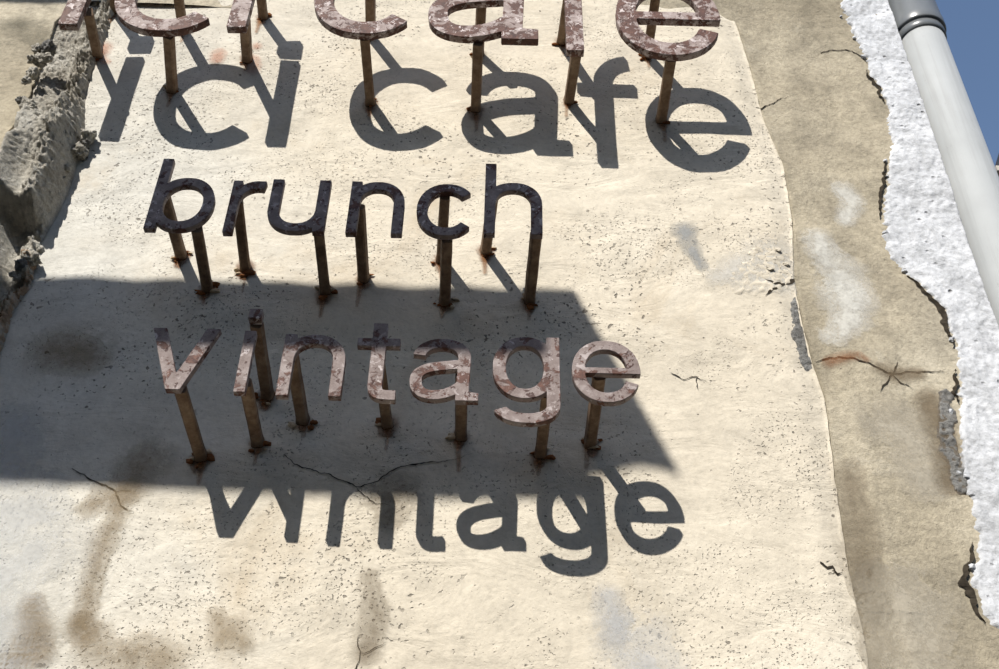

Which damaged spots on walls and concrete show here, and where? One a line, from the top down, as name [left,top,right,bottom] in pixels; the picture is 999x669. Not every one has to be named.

spalling [0,0,115,354]
peeling [840,0,999,629]
crack [814,356,944,390]
crack [72,468,131,511]
crack [285,452,474,504]
crack [355,638,383,669]